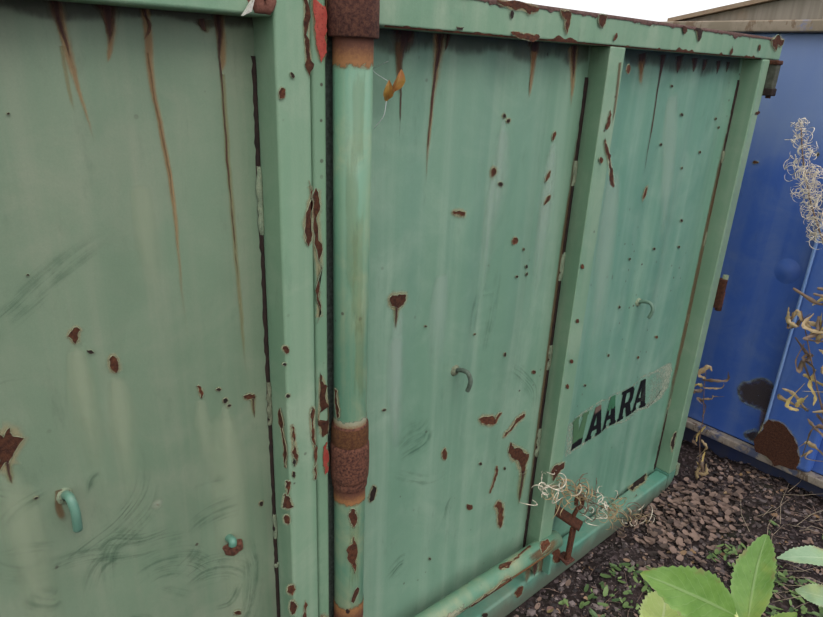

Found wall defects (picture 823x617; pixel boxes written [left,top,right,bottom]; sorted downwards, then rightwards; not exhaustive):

corrosion [142,8,178,245]
corrosion [332,37,374,69]
corrosion [384,0,785,161]
corrosion [304,180,323,323]
corrosion [672,158,722,389]
corrosion [503,162,574,501]
corrosion [0,427,25,482]
corrosion [310,373,367,480]
corrosion [479,412,502,426]
corrosion [738,379,800,470]
corrosion [286,584,298,615]
corrosion [464,539,560,610]